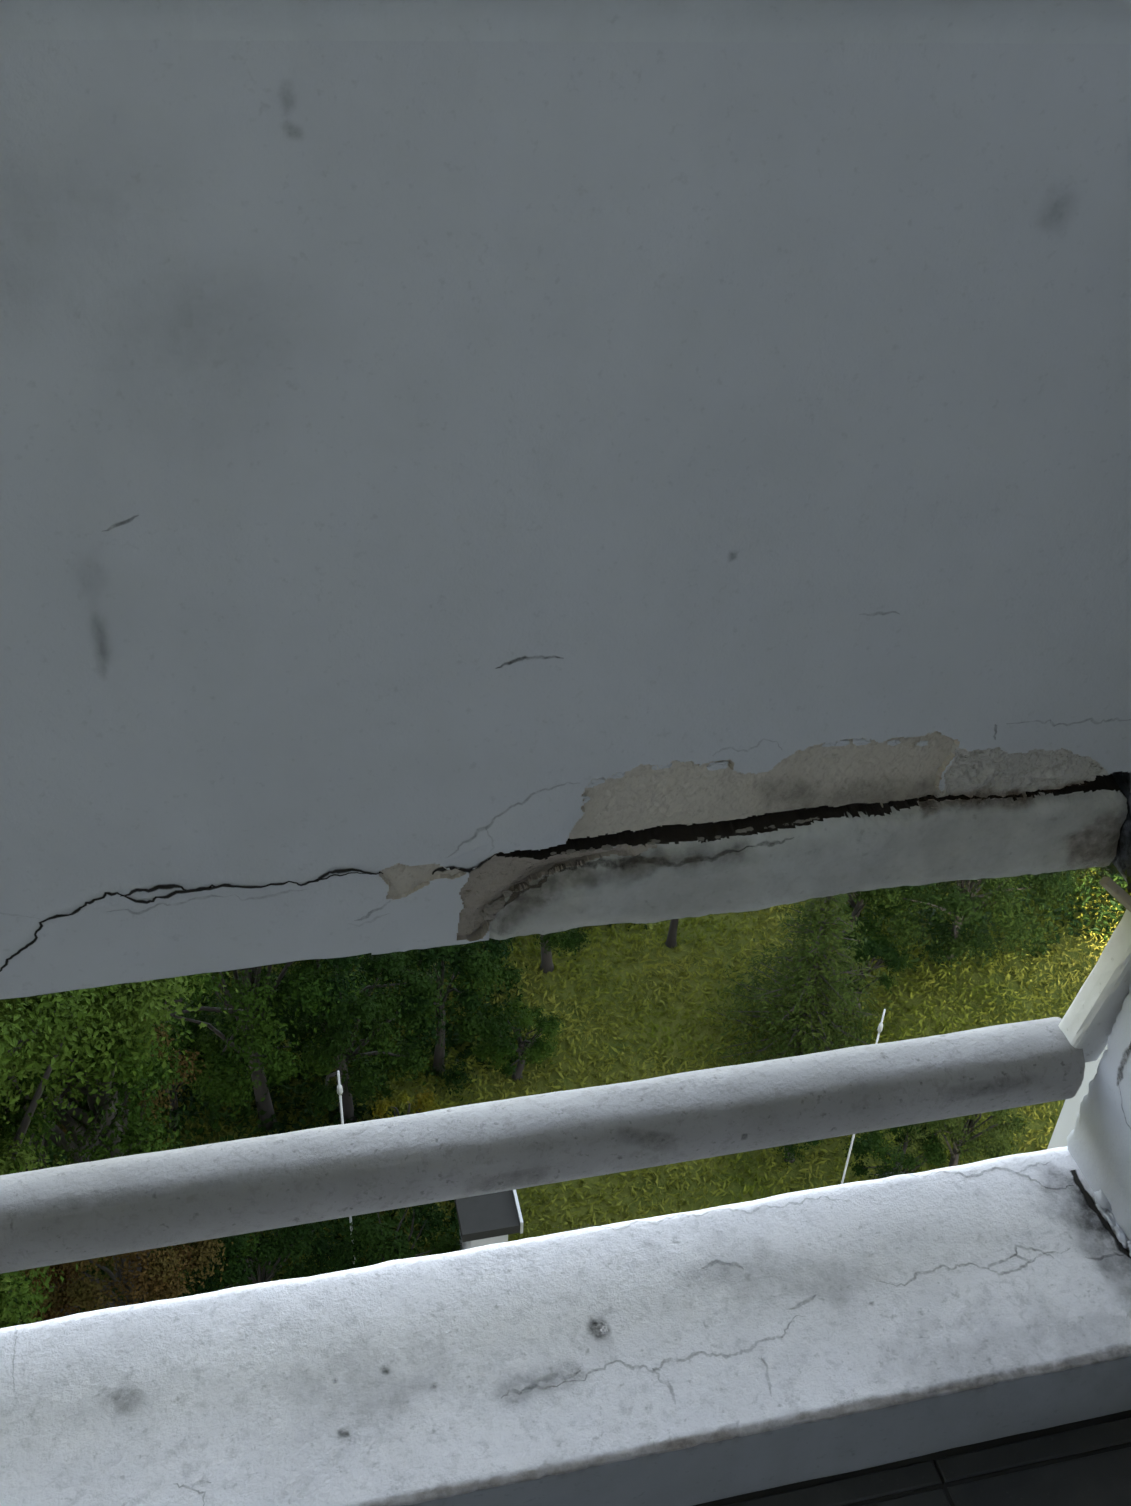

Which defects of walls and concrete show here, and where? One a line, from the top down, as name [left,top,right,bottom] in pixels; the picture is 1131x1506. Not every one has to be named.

flaking render [379,731,960,942]
leakage [1101,771,1131,874]
crack [0,868,383,972]
crack [1117,1046,1131,1126]